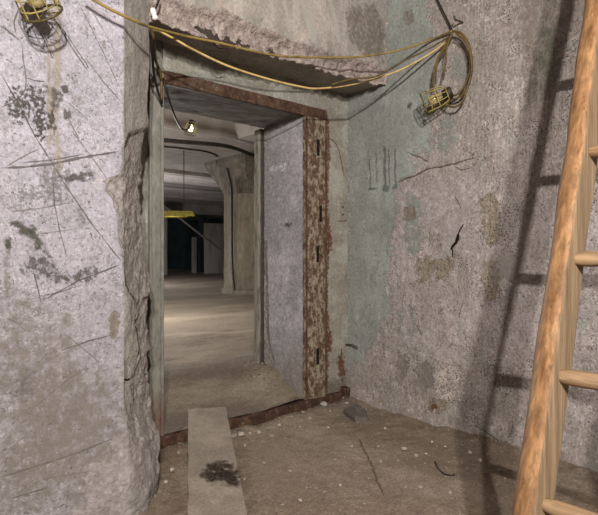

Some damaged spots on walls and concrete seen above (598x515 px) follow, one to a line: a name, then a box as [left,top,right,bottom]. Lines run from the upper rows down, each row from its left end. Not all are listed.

leakage [35,103,55,141]
peeling [148,0,458,385]
crack [398,152,476,182]
crack [450,197,464,257]
spalling [414,357,466,414]